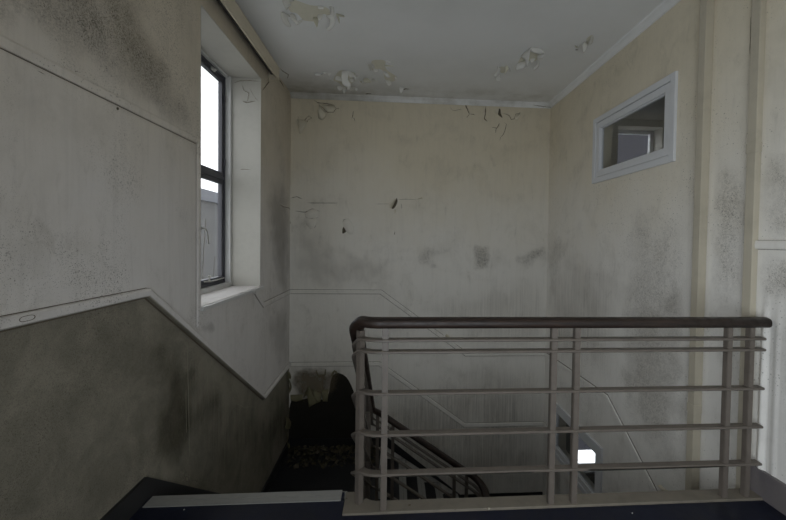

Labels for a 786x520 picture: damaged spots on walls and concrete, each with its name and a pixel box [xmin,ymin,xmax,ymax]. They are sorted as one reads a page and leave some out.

crack [450,105,507,141]